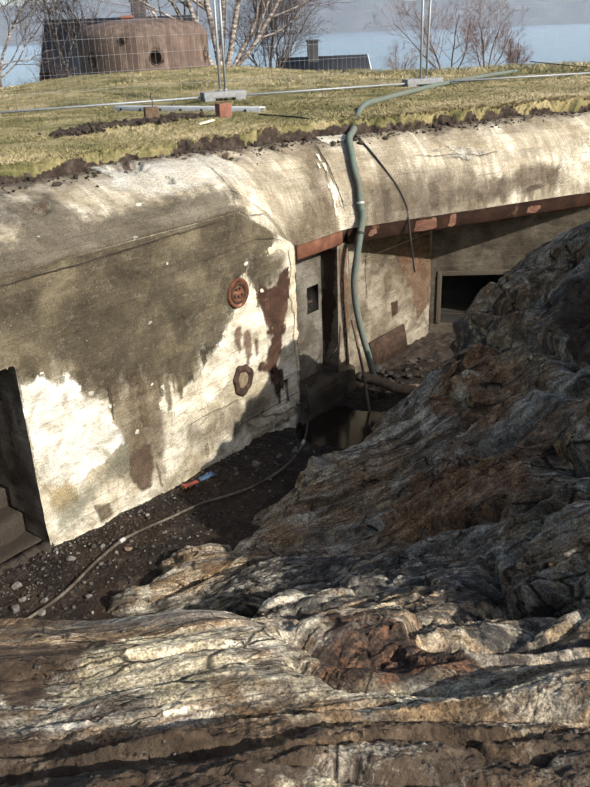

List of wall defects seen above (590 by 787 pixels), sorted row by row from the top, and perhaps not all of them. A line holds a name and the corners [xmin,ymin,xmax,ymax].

damp [0,184,283,491]
rust [235,267,290,402]
damp [44,485,113,526]